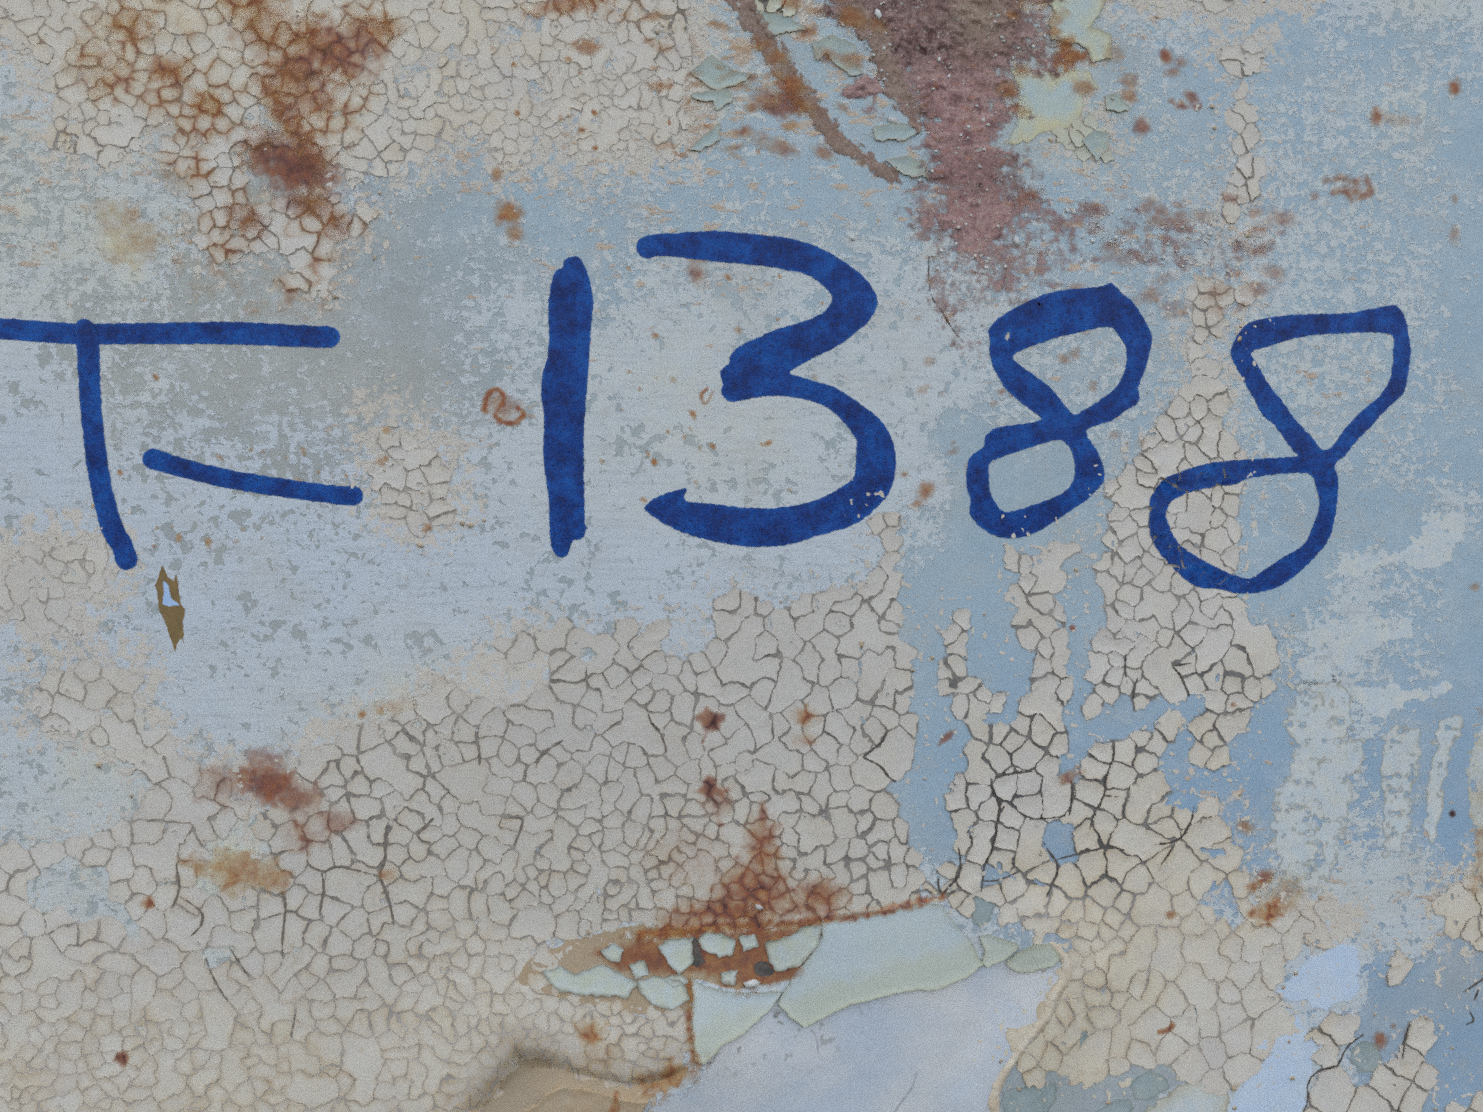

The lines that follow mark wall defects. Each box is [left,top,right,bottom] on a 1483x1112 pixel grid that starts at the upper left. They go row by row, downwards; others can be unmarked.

corrosion [150,61,181,107]
corrosion [245,15,389,235]
peeling [0,0,752,300]
peeling [885,155,929,179]
corrosion [725,0,1100,349]
crack [172,864,249,1009]
crack [261,818,434,957]
spalling [0,274,1483,1112]
corrosion [599,808,945,1087]
crack [862,731,896,783]
crack [937,748,1124,897]
crack [1159,807,1195,864]